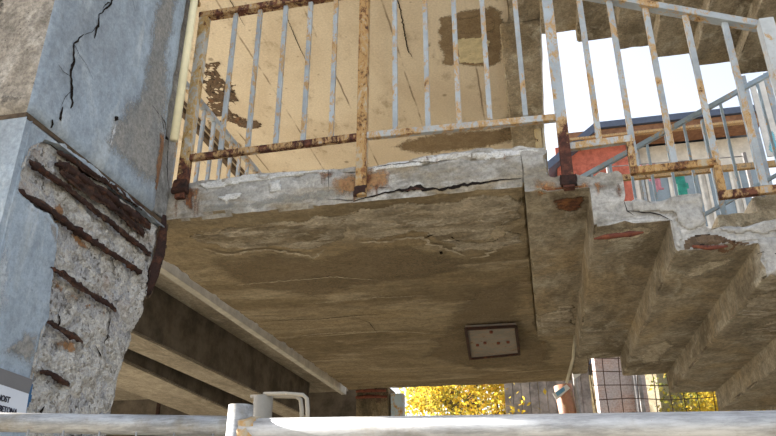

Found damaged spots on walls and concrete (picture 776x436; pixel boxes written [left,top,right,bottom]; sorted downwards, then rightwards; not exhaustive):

crack [50,0,113,128]
damp [438,6,503,66]
damp [396,117,512,154]
crack [328,160,521,202]
corrosion [537,182,603,212]
peeling [632,194,776,276]
spalling [18,143,167,414]